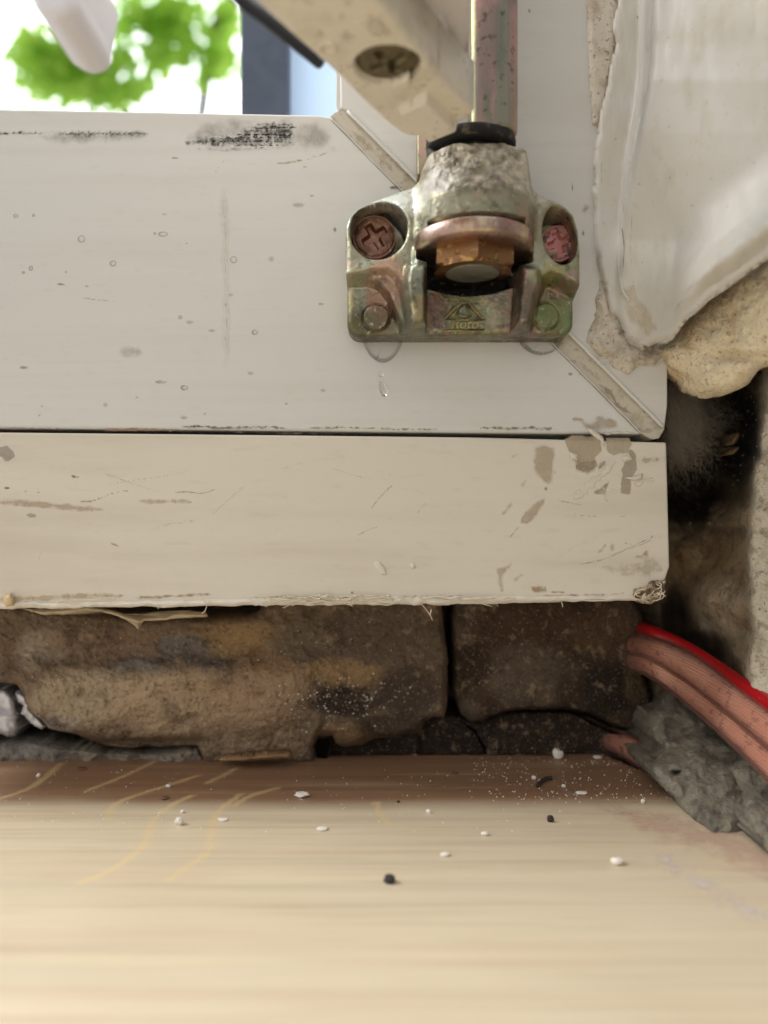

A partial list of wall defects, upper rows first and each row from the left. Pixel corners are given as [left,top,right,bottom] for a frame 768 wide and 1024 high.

peeling [587,428,605,447]